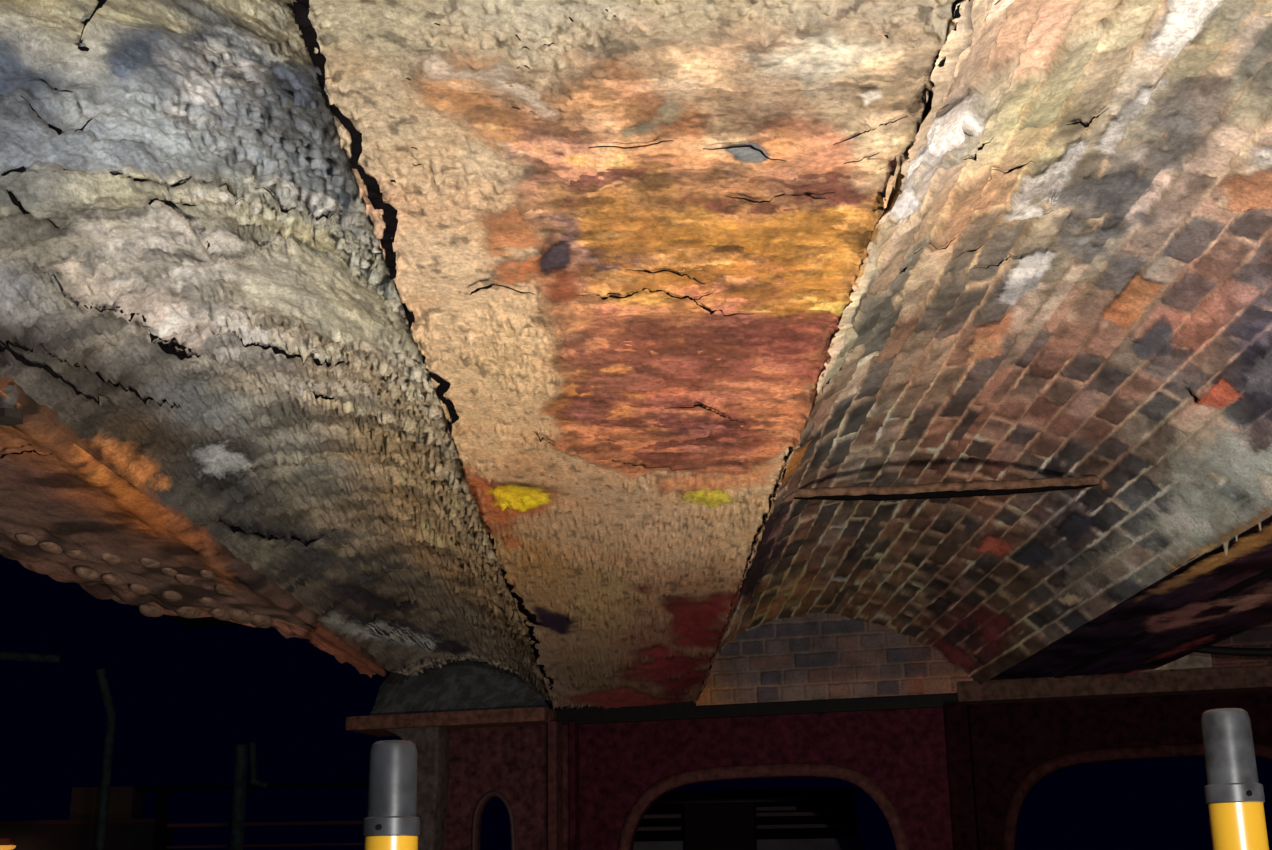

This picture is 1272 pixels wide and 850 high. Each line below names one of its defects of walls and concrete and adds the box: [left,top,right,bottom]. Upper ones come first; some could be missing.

crack [78,0,107,52]
water stain [1144,0,1223,58]
crack [51,274,366,400]
crack [109,171,340,258]
crack [292,0,554,690]
corrosion [485,209,541,284]
crack [578,269,754,317]
spalling [406,19,940,478]
crack [833,0,1000,224]
water stain [891,94,984,224]
water stain [1006,81,1161,222]
water stain [1215,148,1272,213]